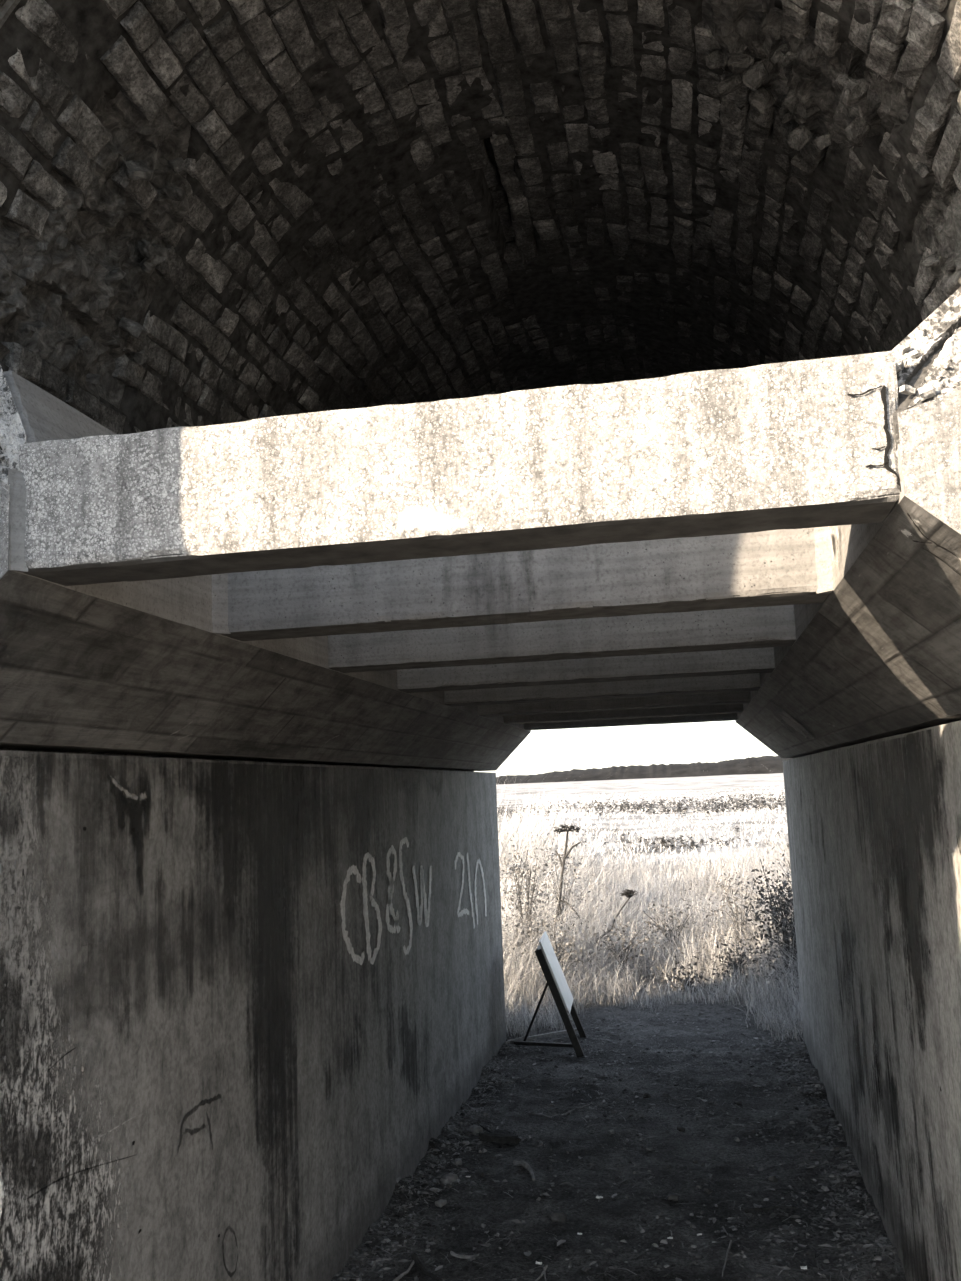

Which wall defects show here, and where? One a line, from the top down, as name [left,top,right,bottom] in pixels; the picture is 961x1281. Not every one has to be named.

spalling [0,90,191,501]
crack [847,385,961,576]
water stain [11,752,443,1281]
water stain [834,729,958,1281]